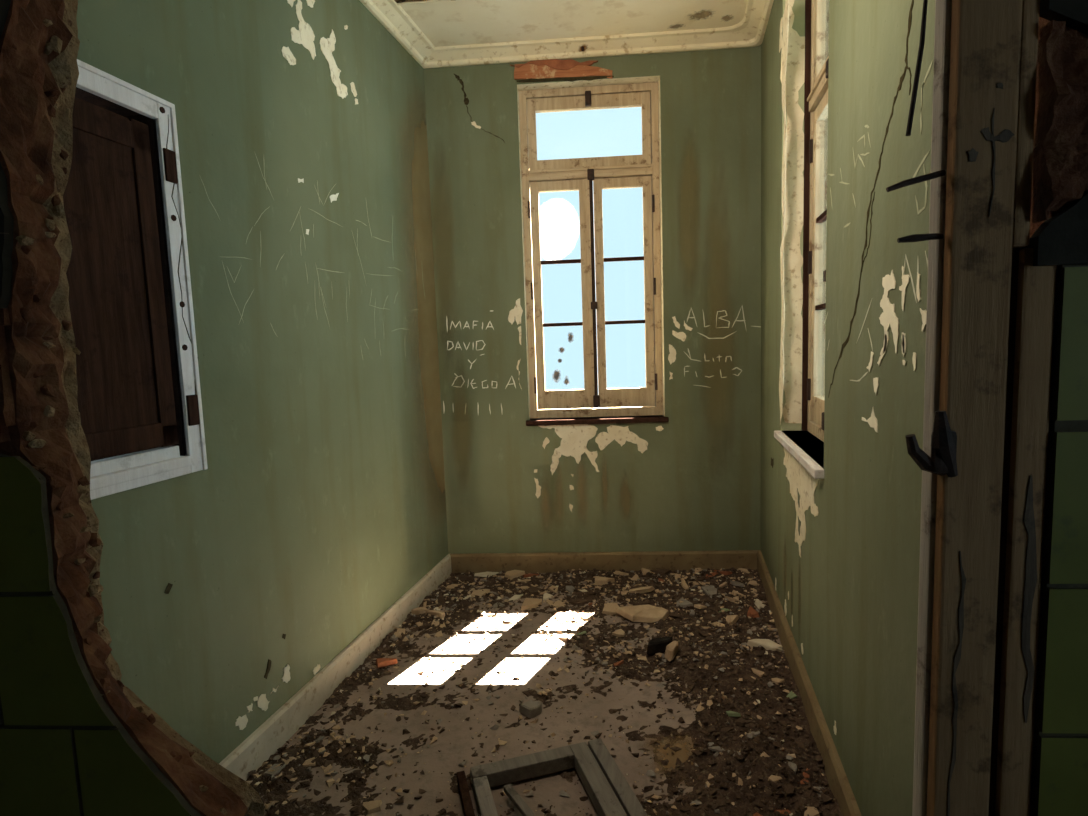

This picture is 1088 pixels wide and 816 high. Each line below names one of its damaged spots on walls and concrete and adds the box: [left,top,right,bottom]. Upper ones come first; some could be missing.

peeling [282,0,358,105]
crack [454,74,505,143]
peeling [779,0,805,425]
crack [828,0,914,398]
peeling [862,266,927,432]
flaking render [77,476,90,494]
peeling [538,424,648,490]
peeling [771,448,819,557]
peeling [235,659,291,730]